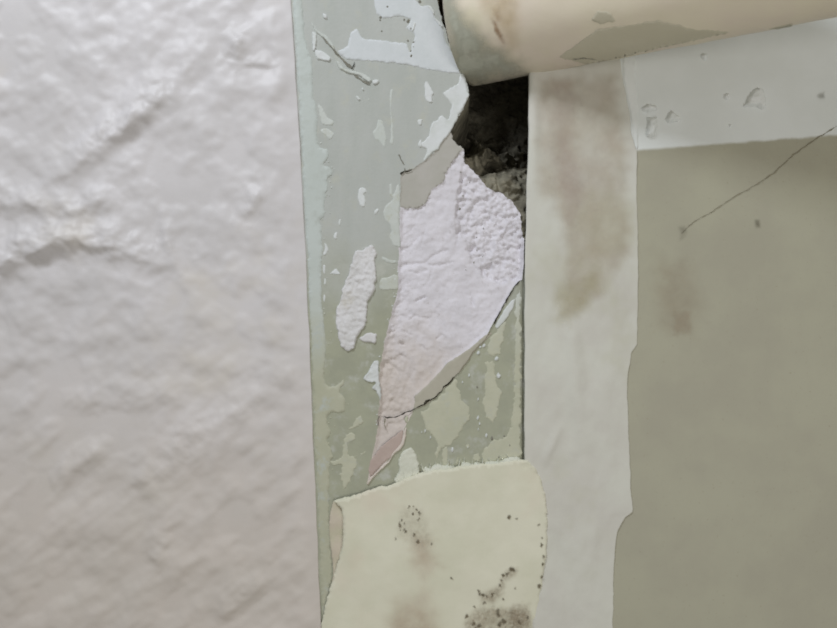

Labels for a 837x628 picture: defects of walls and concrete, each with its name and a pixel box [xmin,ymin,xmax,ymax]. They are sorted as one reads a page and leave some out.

peeling [560,10,728,64]
crack [682,127,835,233]
flaking render [311,0,528,489]